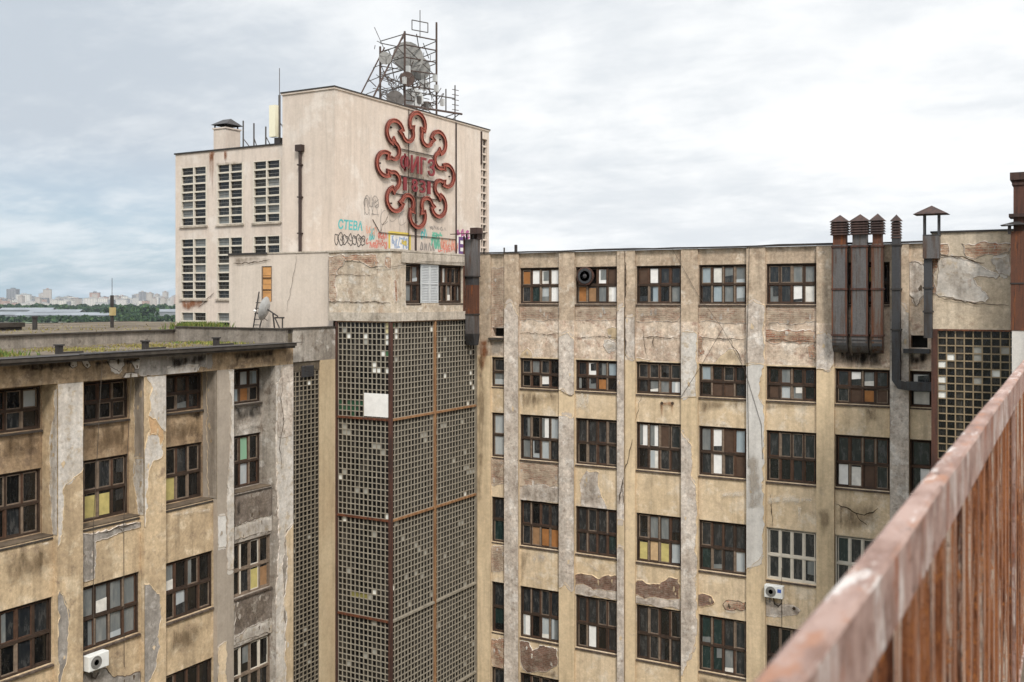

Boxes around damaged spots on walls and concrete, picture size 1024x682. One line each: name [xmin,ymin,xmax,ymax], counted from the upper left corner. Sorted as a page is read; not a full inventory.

peeling [44,382,83,546]
peeling [83,353,212,582]
spalling [329,253,398,303]
peeling [491,267,834,682]
crack [837,504,877,526]
peeling [890,240,1011,520]